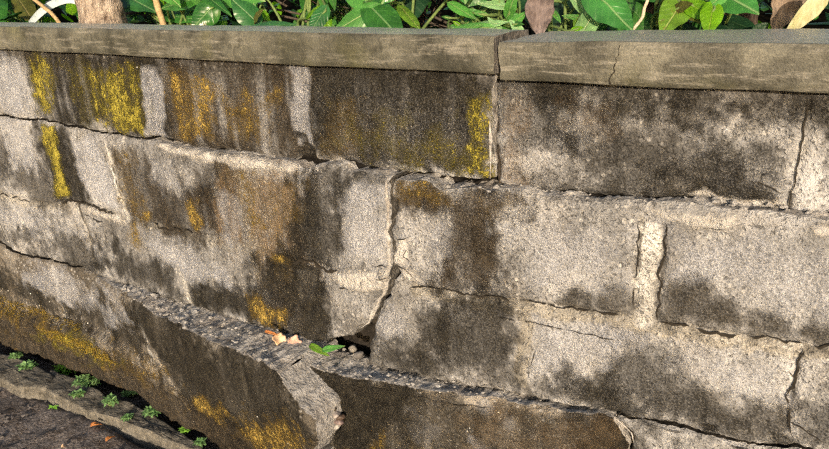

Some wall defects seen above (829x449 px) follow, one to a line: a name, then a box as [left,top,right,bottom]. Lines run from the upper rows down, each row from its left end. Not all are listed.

damp [534,81,655,122]
damp [666,88,715,133]
damp [780,93,827,122]
damp [74,137,116,205]
crack [756,104,808,208]
crack [286,171,829,442]
damp [558,288,621,314]
damp [661,276,790,337]
damp [800,325,829,346]